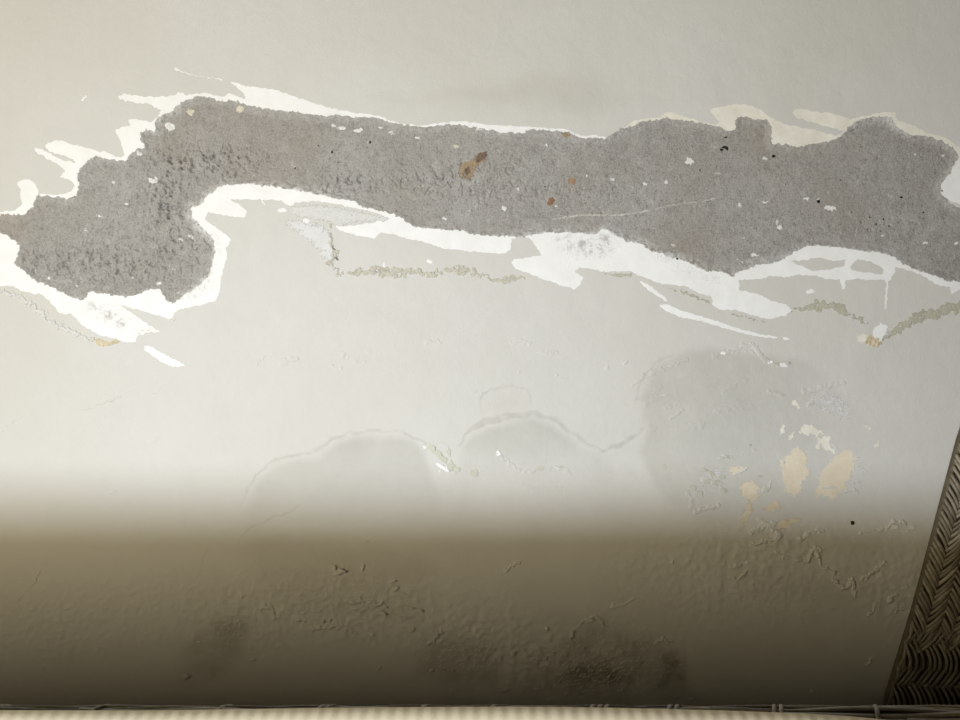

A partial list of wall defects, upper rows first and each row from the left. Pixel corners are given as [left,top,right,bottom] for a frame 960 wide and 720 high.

corrosion [458,152,487,180]
spalling [0,68,960,368]
peeling [780,424,859,500]